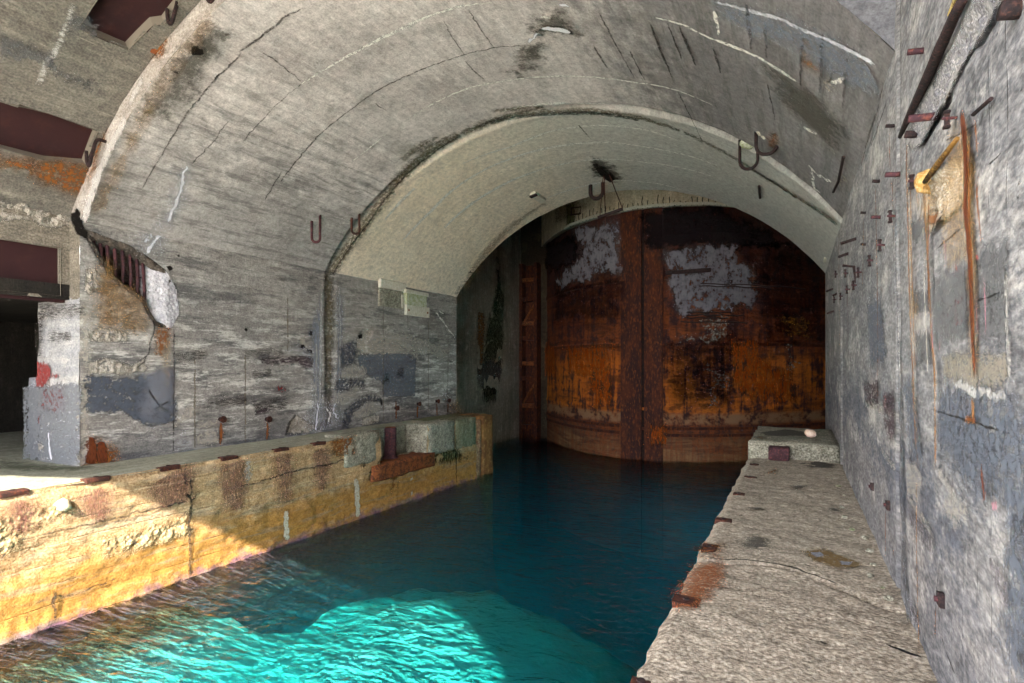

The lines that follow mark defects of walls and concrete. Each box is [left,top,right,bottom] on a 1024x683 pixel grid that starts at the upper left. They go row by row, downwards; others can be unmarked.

leakage [129,28,229,118]
crack [143,9,300,187]
leakage [515,4,584,78]
crack [594,13,721,138]
corrosion [0,129,107,195]
leakage [82,119,127,222]
leakage [313,105,837,430]
corrosion [960,112,981,374]
spalling [76,230,179,465]
corrosion [83,436,118,465]
crack [2,480,196,574]
corrosion [671,544,726,610]